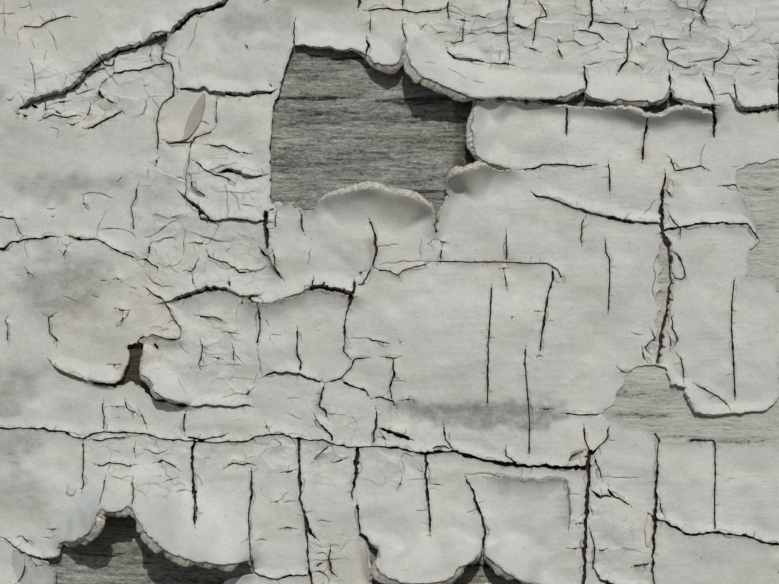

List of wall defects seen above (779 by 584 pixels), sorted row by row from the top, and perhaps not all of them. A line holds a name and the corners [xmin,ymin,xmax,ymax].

crack [0,0,284,368]
peeling [269,23,720,276]
crack [358,0,779,411]
peeling [736,159,779,293]
peeling [59,339,206,407]
crack [0,210,779,584]
peeling [604,236,779,451]
peeling [12,499,306,584]
peeling [331,484,568,584]